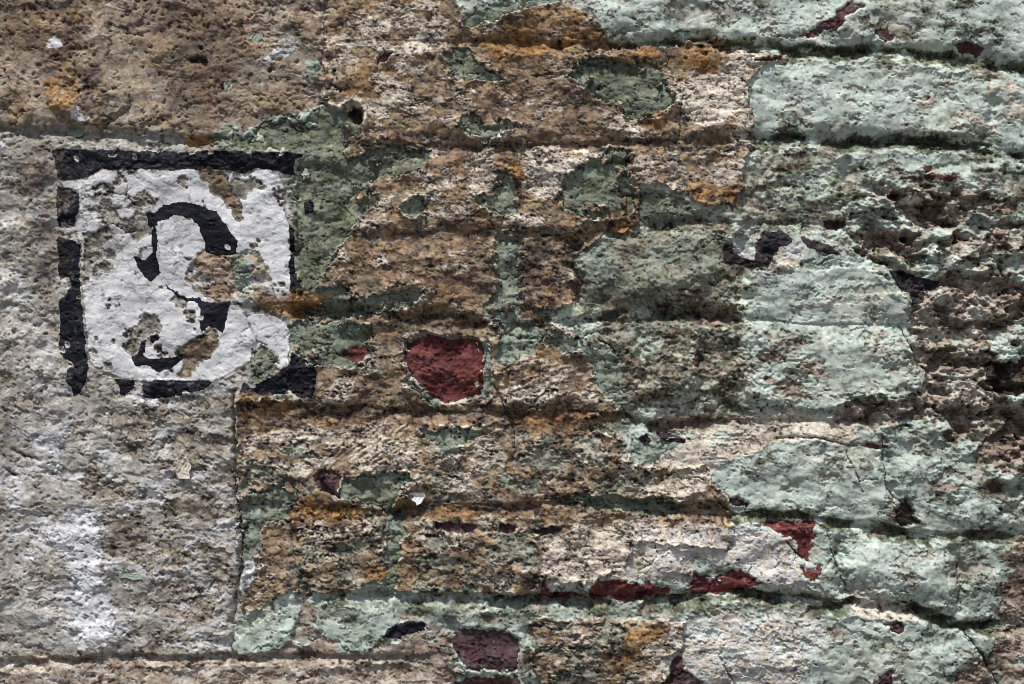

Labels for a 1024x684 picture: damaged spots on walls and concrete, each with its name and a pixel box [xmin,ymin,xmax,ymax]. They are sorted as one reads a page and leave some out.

peeling [559,149,696,231]
peeling [210,104,428,370]
spalling [188,252,270,302]
spalling [178,331,217,378]
peeling [401,234,710,467]
crack [776,429,901,506]
flaking render [435,521,477,535]
flaking render [535,579,671,603]
peeling [575,487,683,522]
flaking render [687,553,760,595]
flaking render [762,517,822,581]
flaking render [451,628,521,684]